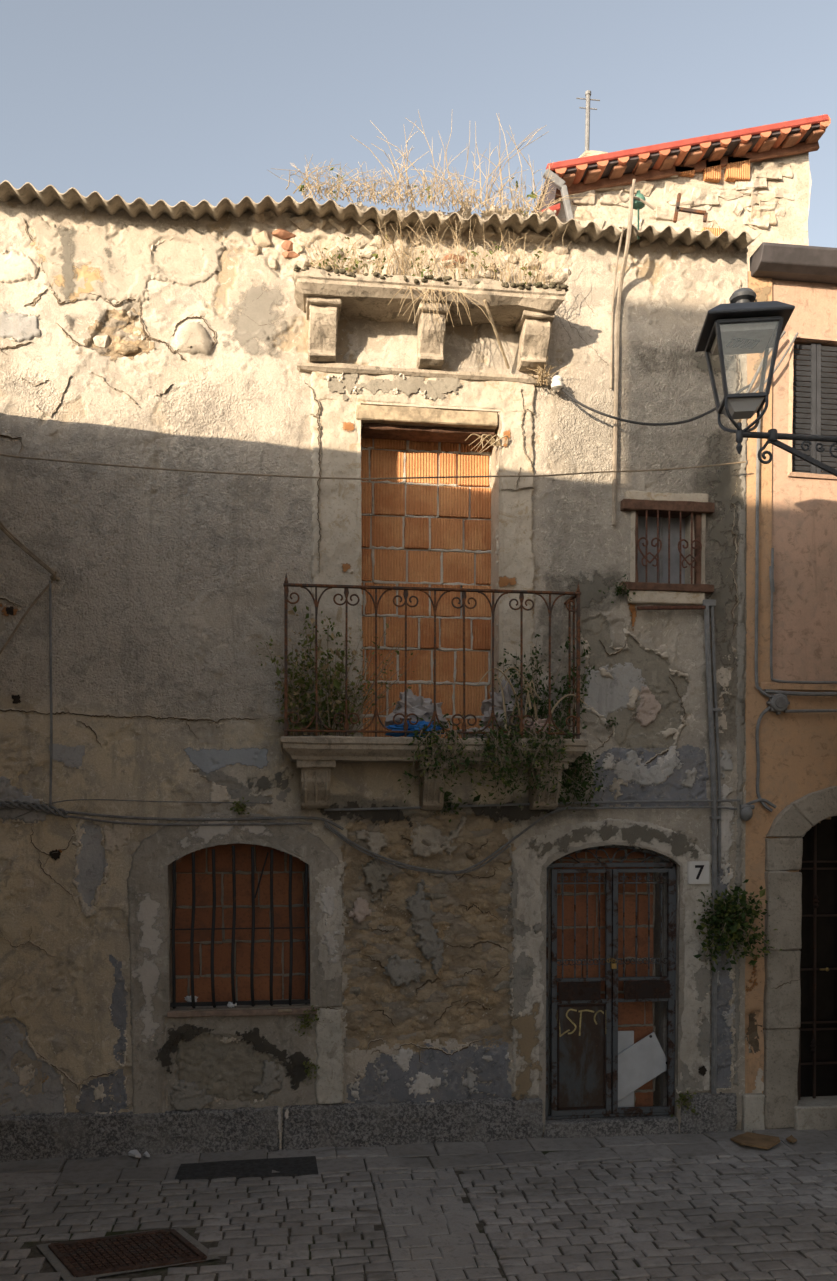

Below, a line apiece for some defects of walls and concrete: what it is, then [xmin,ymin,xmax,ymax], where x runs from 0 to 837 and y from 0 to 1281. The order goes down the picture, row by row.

crack [0,220,191,360]
peeling [324,372,461,401]
peeling [189,767,291,811]
peeling [580,613,737,900]
peeling [75,955,129,1114]
peeling [347,1038,514,1104]
peeling [509,918,542,1020]
peeling [694,916,764,1094]